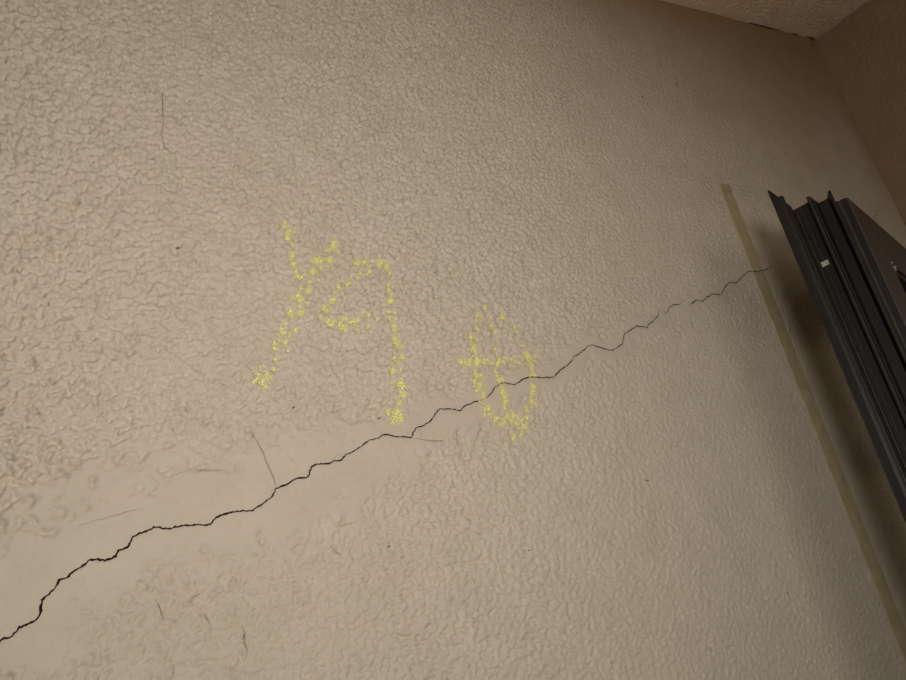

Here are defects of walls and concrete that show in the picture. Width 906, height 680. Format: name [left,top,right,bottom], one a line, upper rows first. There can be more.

crack [0,266,773,642]